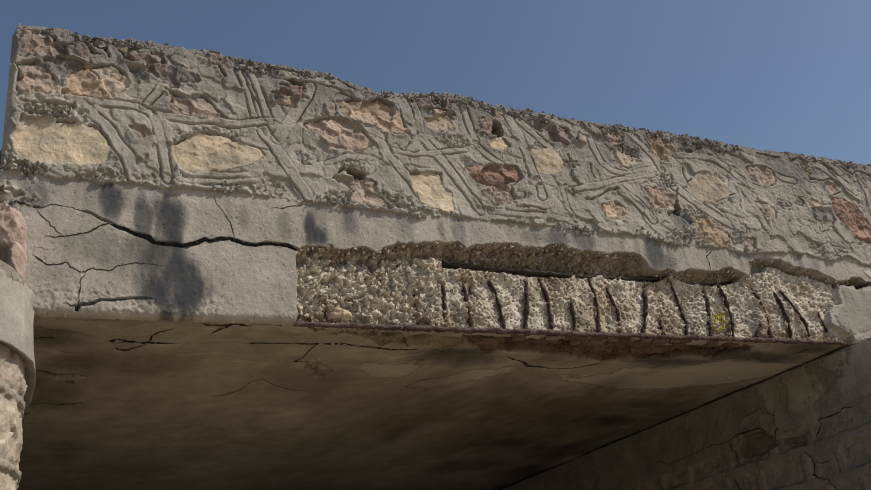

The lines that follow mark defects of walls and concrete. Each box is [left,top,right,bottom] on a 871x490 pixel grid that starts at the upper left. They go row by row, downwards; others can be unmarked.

water stain [102,183,121,215]
crack [1,197,297,309]
water stain [137,197,204,319]
crack [110,328,174,351]
crack [203,323,417,362]
spalling [294,241,871,390]
crack [654,427,786,490]
crack [804,406,854,490]